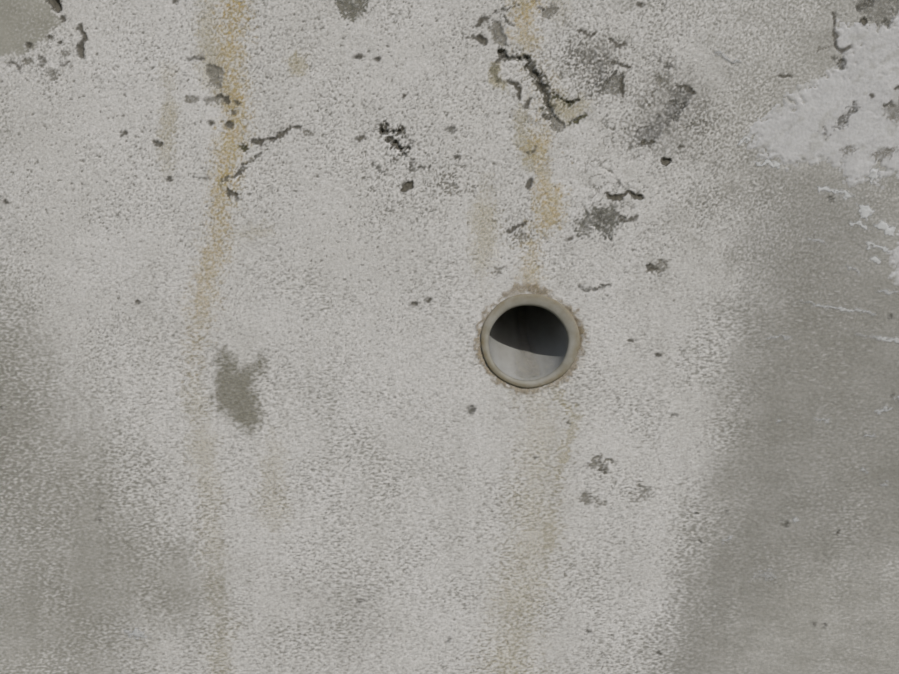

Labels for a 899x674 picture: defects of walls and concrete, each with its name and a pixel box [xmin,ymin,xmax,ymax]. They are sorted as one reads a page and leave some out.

rust [217,0,249,196]
crack [496,49,587,132]
crack [203,126,311,200]
damp [217,355,261,426]